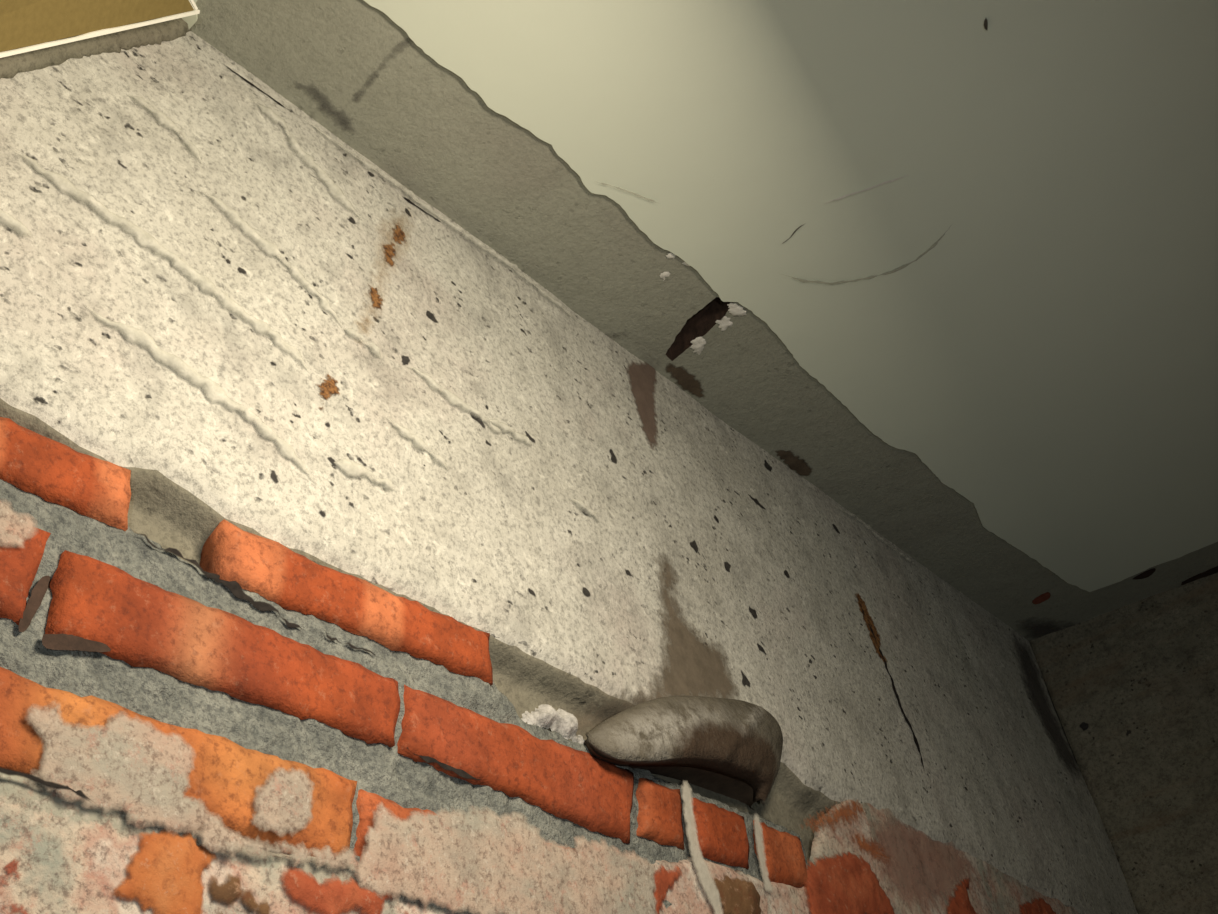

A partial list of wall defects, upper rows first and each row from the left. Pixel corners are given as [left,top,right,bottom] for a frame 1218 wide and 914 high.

corrosion [369,285,383,308]
corrosion [383,225,405,266]
flaking render [191,0,1218,641]
crack [792,233,945,285]
corrosion [317,374,340,410]
damp [627,362,658,447]
flaking render [0,501,35,546]
damp [575,562,736,729]
crack [855,594,925,771]
flaking render [28,705,682,914]
damp [682,782,723,914]
flaking render [805,800,976,914]